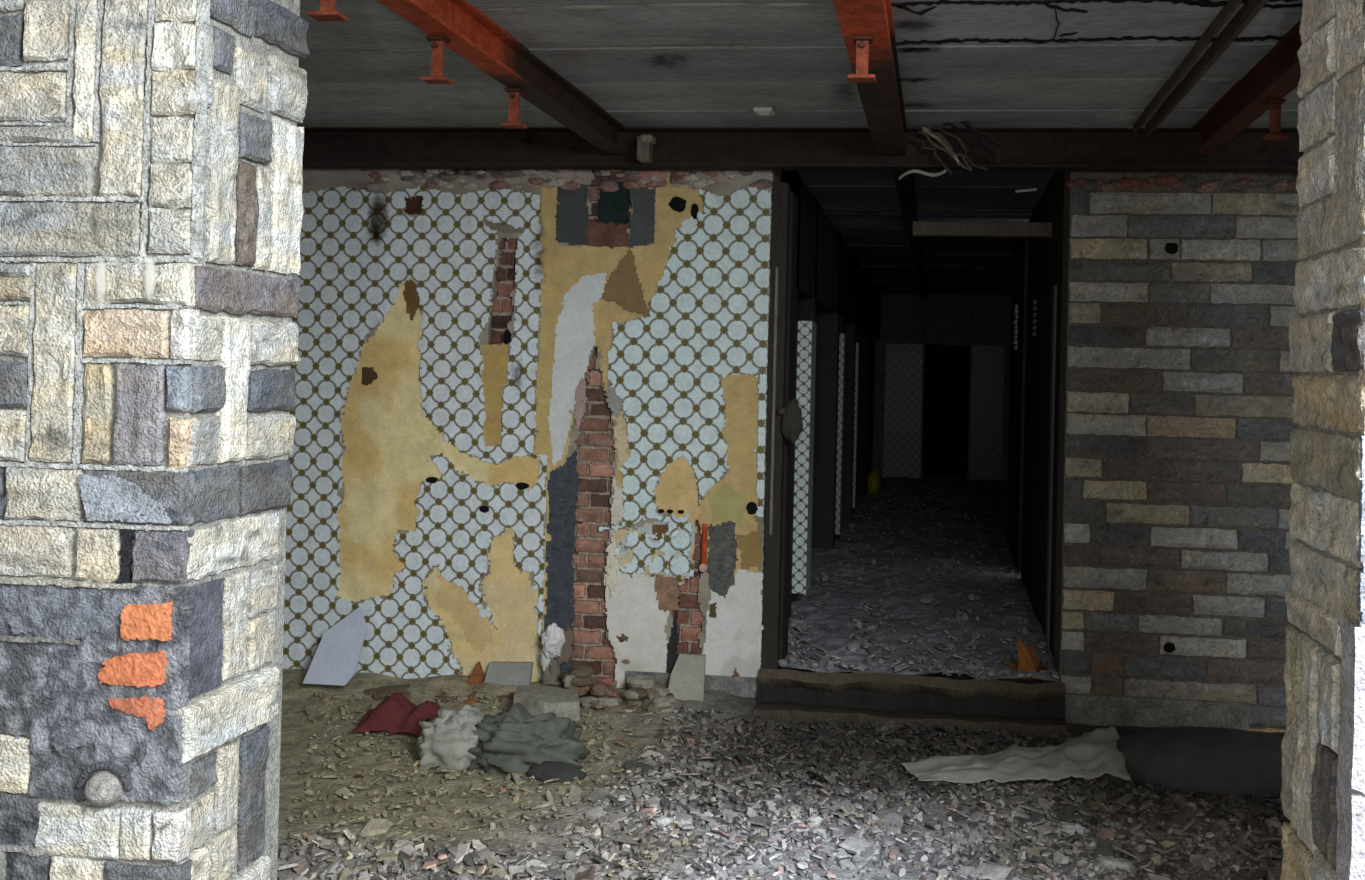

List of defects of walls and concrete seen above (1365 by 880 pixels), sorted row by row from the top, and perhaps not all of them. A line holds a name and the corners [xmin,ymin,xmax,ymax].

crack [891,0,1303,50]
peeling [337,169,773,688]